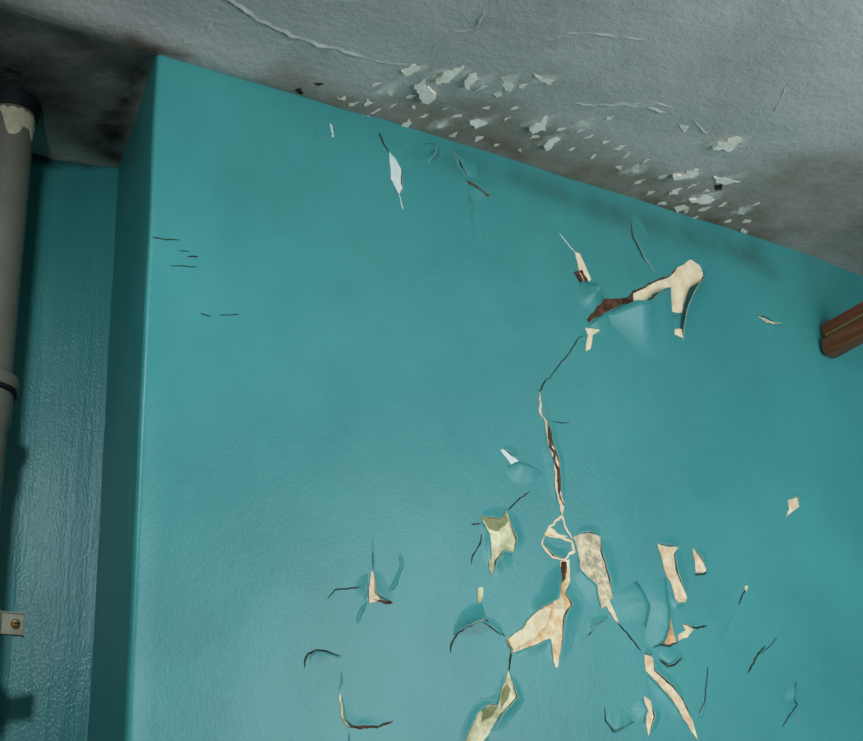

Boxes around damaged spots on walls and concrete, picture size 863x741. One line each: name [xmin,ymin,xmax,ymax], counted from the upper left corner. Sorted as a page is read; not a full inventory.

crack [225,0,410,66]
peeling [337,64,557,142]
peeling [379,132,411,208]
peeling [646,169,760,234]
crack [153,237,198,267]
peeling [550,233,714,378]
crack [537,378,567,515]
peeling [471,445,542,577]
crack [328,538,404,624]
peeling [450,515,708,741]
crack [304,649,393,741]
crack [696,668,708,718]